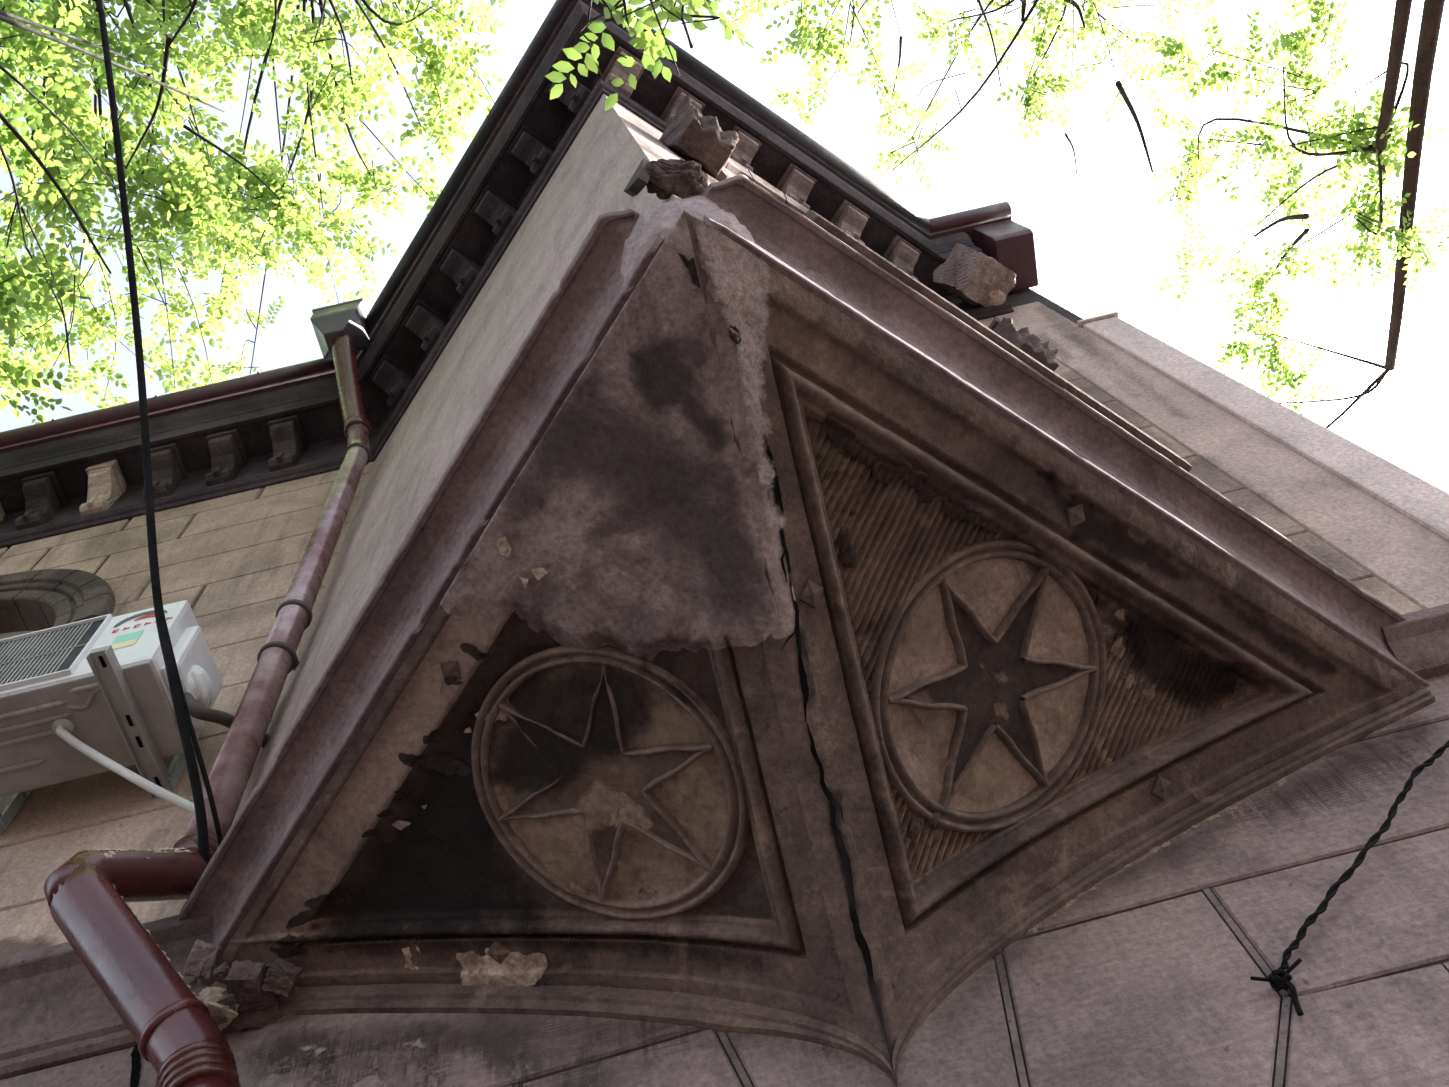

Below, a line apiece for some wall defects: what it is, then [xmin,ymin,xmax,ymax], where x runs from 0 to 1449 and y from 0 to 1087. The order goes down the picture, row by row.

spalling [933,243,1016,307]
spalling [620,158,786,530]
leakage [633,338,725,449]
peeling [460,643,487,661]
crack [760,398,874,993]
peeling [398,728,473,777]
peeling [362,788,410,838]
spalling [183,882,359,1032]
spalling [401,946,420,971]
spalling [456,948,573,986]
crack [130,1043,141,1087]